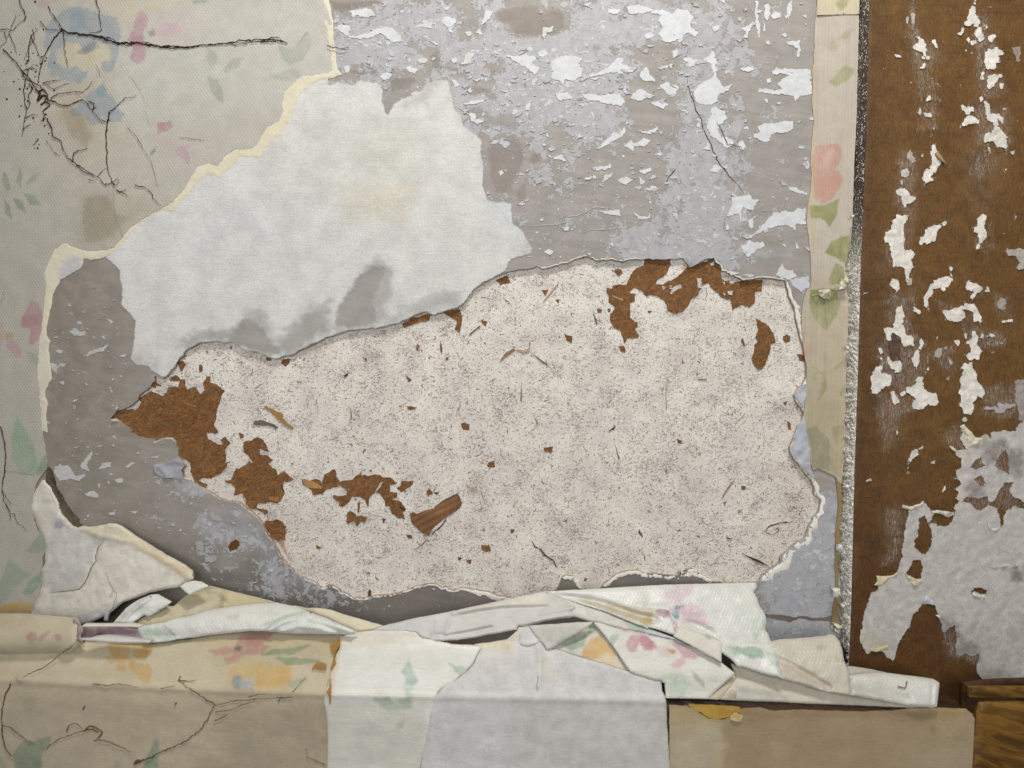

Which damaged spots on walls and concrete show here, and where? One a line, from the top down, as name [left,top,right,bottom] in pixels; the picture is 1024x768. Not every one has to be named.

peeling [334,8,401,57]
peeling [413,7,493,37]
peeling [741,0,807,45]
peeling [506,4,793,150]
peeling [758,40,812,105]
peeling [596,122,662,158]
crack [687,82,742,188]
peeling [595,164,660,219]
peeling [722,194,806,257]
peeling [888,333,901,360]
spalling [112,249,825,601]
peeling [54,436,135,498]